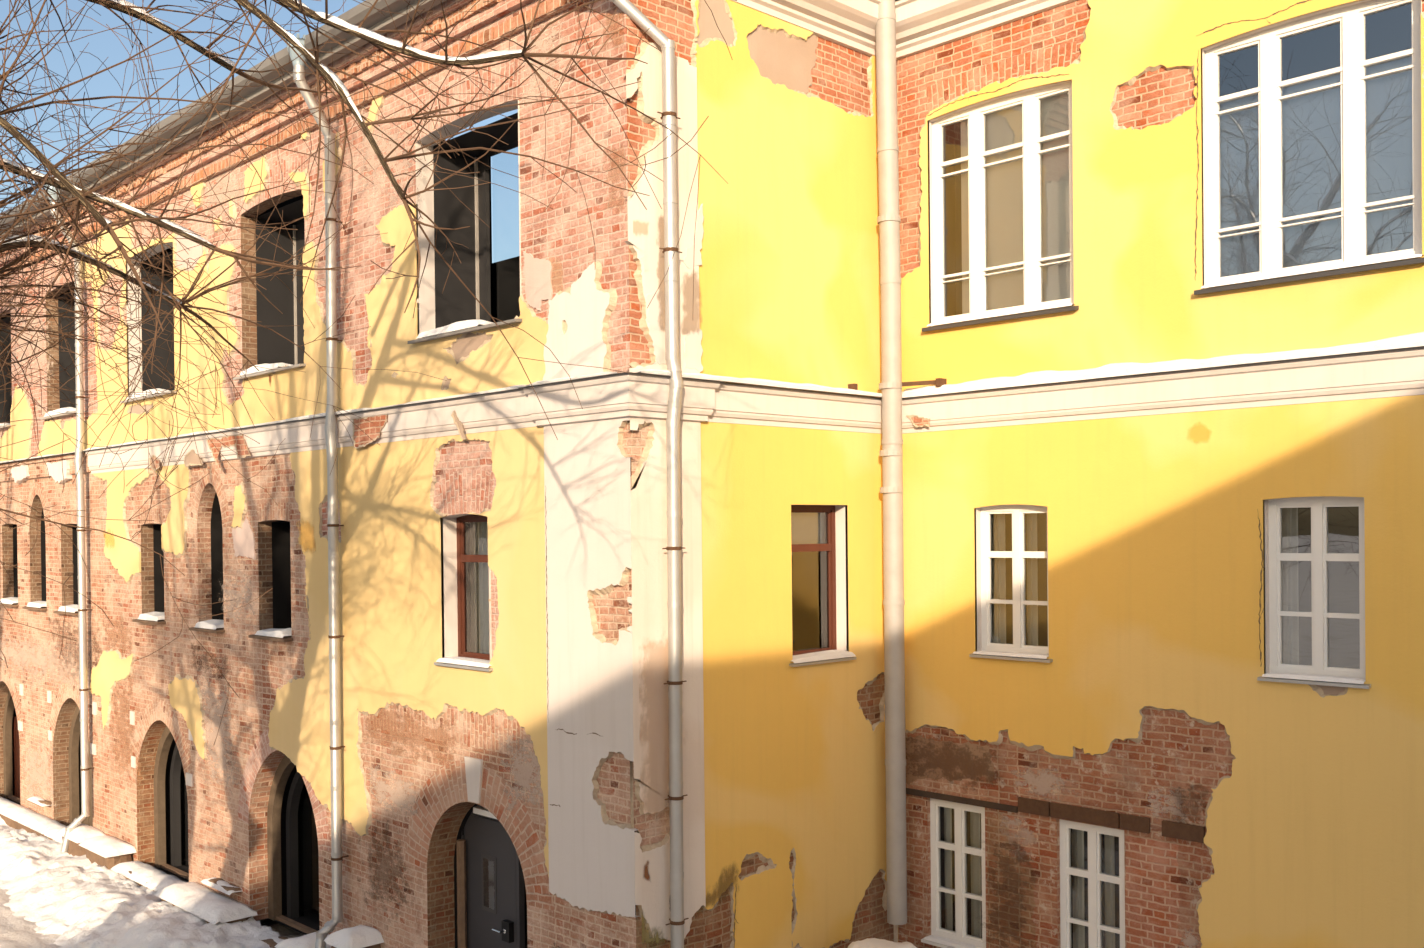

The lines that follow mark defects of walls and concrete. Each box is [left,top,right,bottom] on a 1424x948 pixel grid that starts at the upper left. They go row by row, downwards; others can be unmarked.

flaking render [113,0,874,406]
flaking render [896,0,1091,278]
flaking render [1110,65,1197,130]
flaking render [0,234,127,464]
flaking render [617,421,655,489]
flaking render [0,454,311,907]
flaking render [318,702,549,948]
flaking render [587,567,632,645]
flaking render [592,752,670,852]
flaking render [527,848,802,948]
flaking render [857,672,885,732]
flaking render [823,706,1236,948]